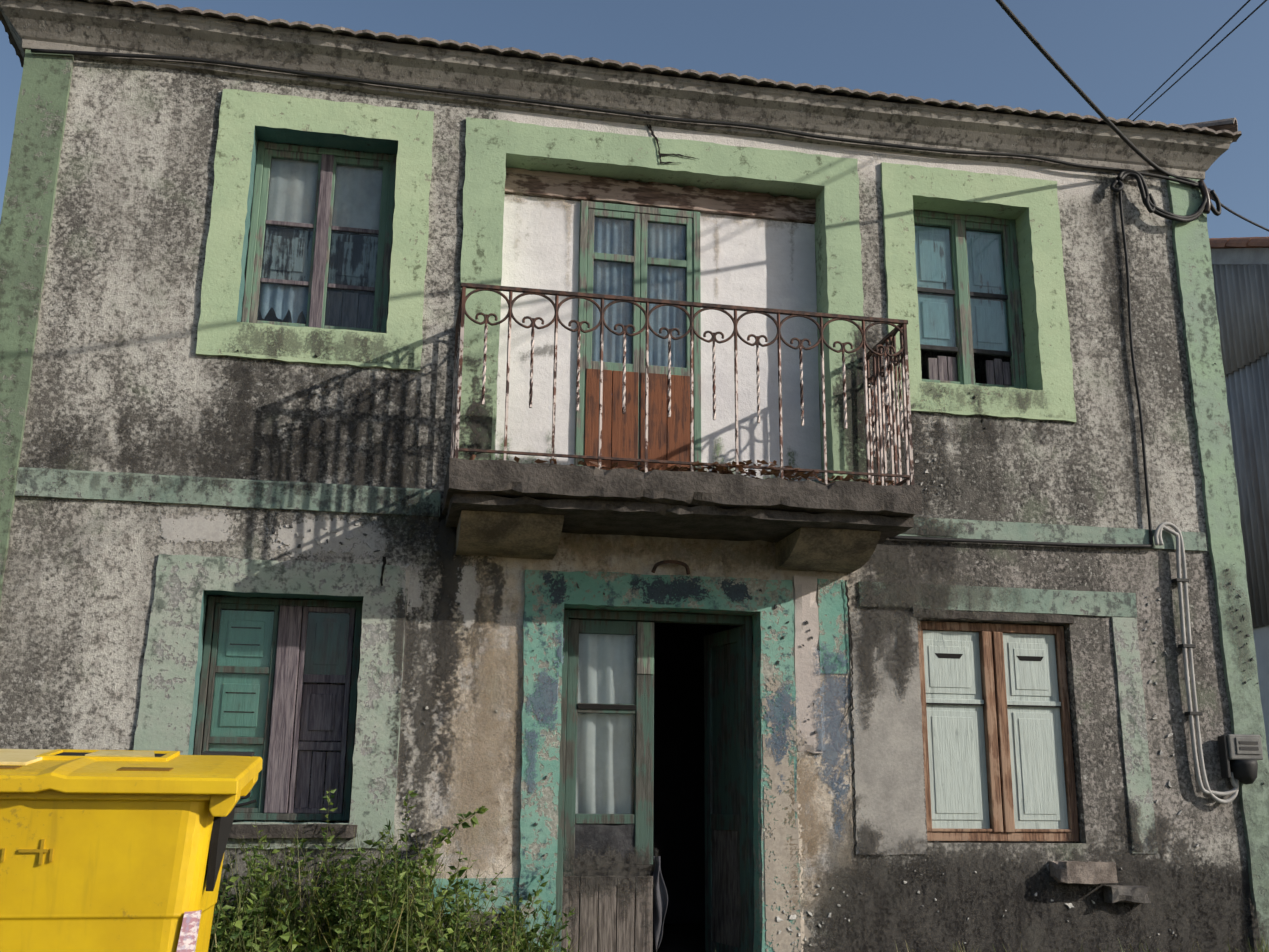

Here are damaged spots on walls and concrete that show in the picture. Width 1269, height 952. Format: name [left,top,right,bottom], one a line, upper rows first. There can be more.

crack [641,110,698,164]
leakage [388,500,506,863]
peeling [525,572,579,794]
peeling [629,575,762,605]
peeling [757,621,862,952]
leakage [833,324,963,728]
leakage [802,796,1267,952]